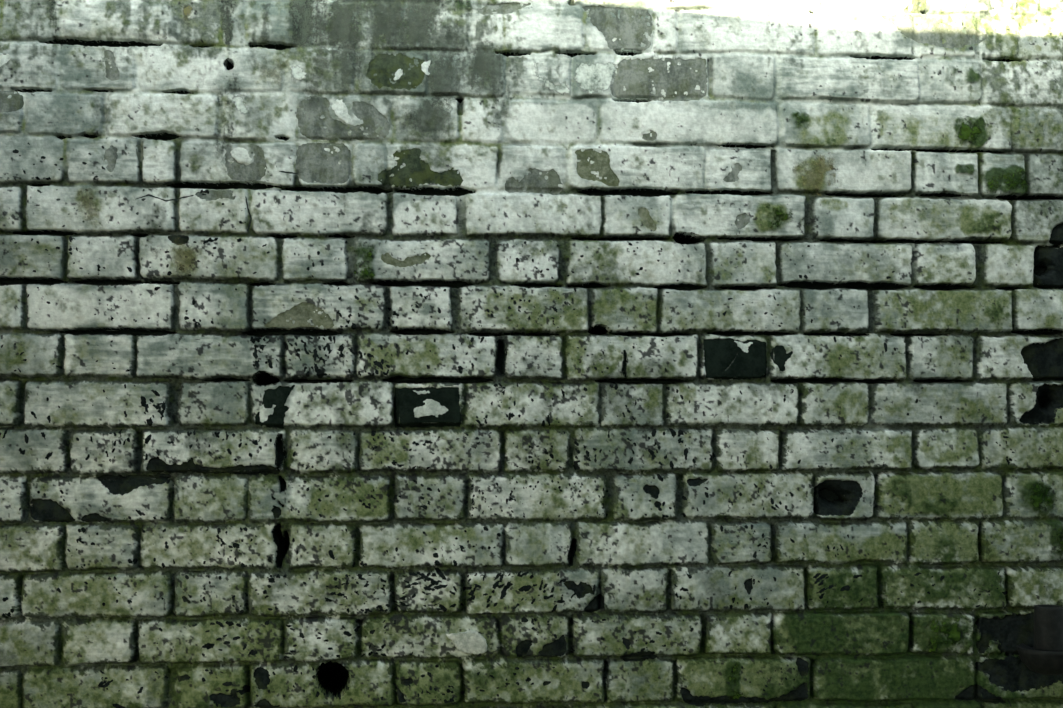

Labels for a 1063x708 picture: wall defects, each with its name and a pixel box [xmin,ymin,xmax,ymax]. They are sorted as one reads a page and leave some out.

leakage [218,0,240,104]
leakage [261,4,270,44]
leakage [289,0,509,132]
peeling [378,148,463,189]
peeling [575,149,620,187]
peeling [250,287,409,378]
flaking render [703,327,794,402]
spalling [1019,338,1063,425]
spalling [97,363,295,496]
flaking render [327,383,526,510]
spalling [763,480,863,516]
spalling [155,574,352,708]